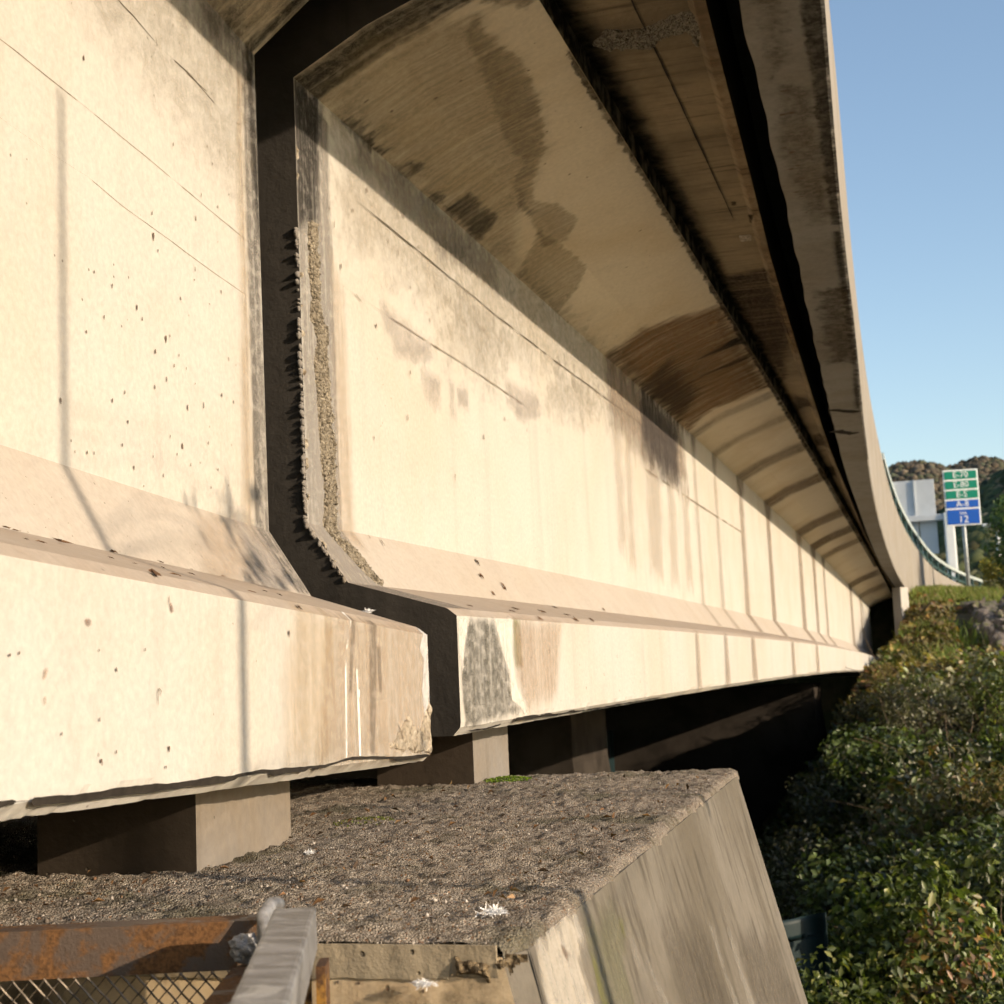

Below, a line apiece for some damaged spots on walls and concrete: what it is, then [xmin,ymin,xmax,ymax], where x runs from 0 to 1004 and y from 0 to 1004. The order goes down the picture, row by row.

crack [118,0,157,42]
crack [0,39,253,246]
water stain [294,0,467,222]
crack [92,180,250,298]
water stain [432,193,512,238]
water stain [524,0,892,672]
water stain [459,620,467,663]
water stain [497,620,557,713]
spalling [389,697,432,754]